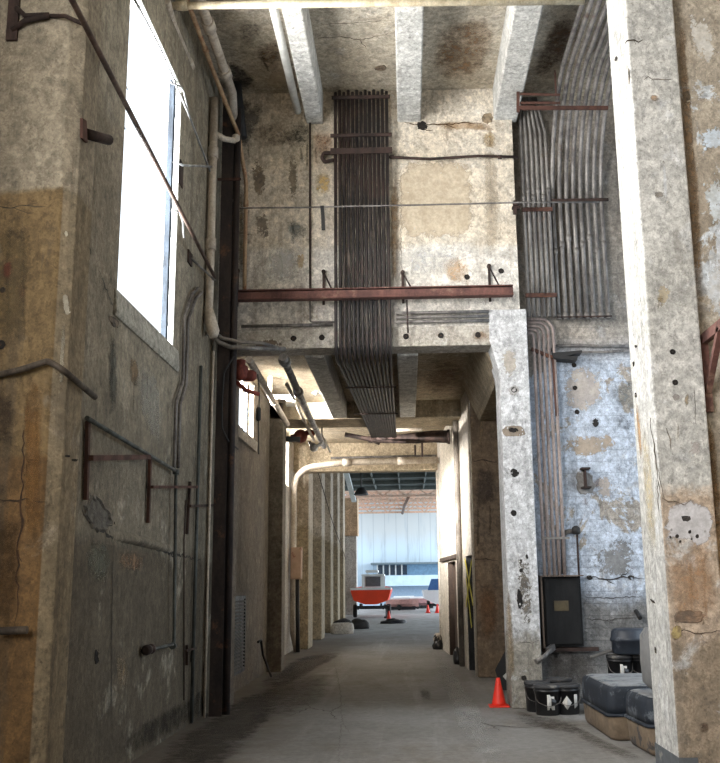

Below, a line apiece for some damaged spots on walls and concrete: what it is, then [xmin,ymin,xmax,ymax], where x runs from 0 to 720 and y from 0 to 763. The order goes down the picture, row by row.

water stain [259,43,279,71]
crack [321,20,394,47]
water stain [436,22,491,74]
water stain [537,21,579,73]
peeling [564,366,604,417]
peeling [563,433,616,458]
crack [0,430,41,623]
spalling [83,495,116,533]
peeling [664,501,713,545]
peeling [515,548,533,640]
crack [586,572,641,599]